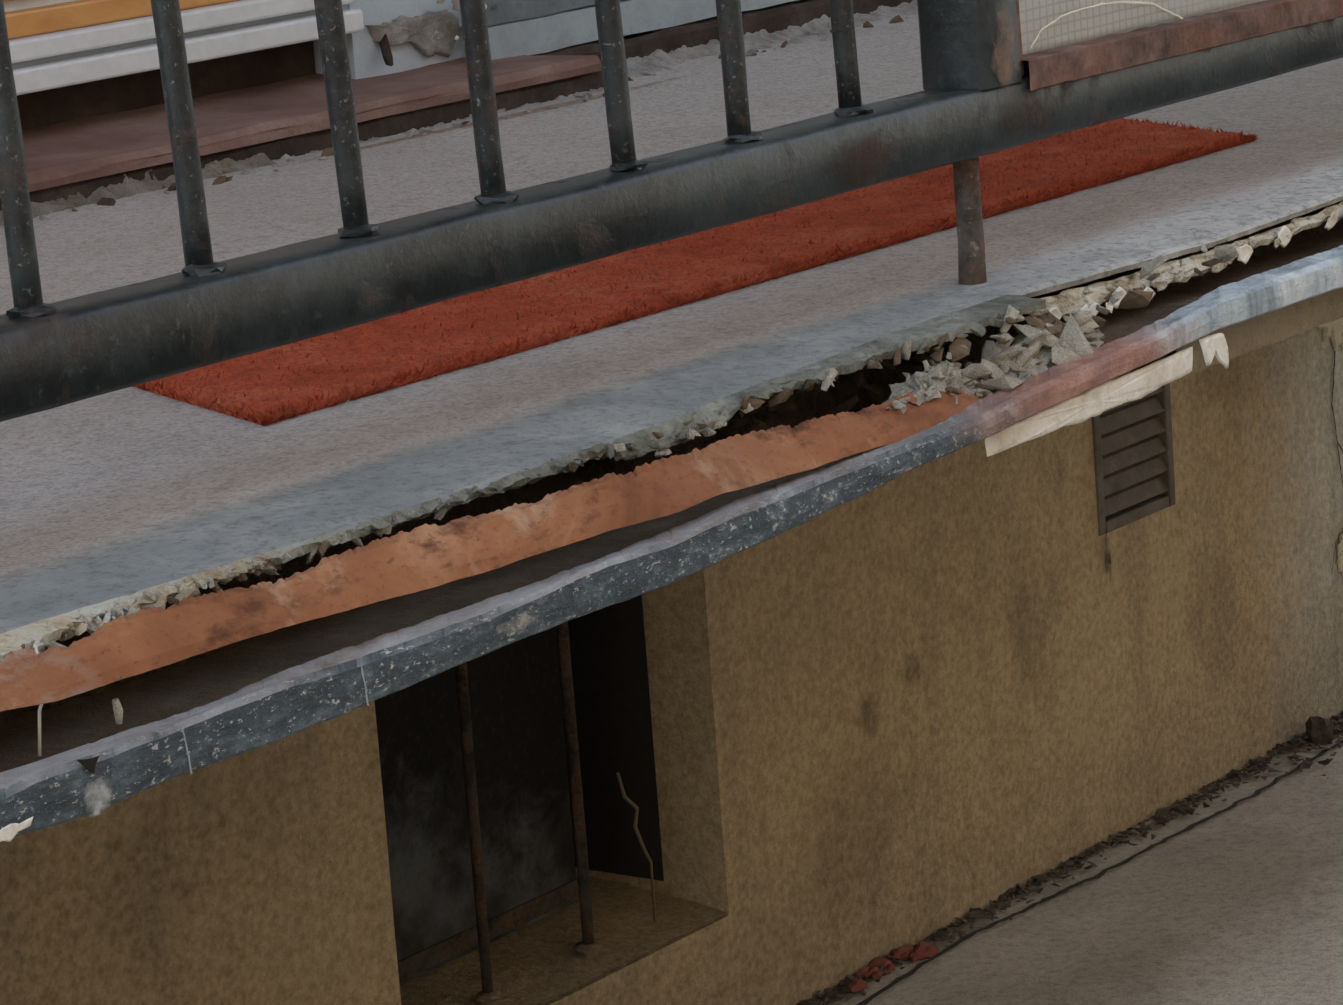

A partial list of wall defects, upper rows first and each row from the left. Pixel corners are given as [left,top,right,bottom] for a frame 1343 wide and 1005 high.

peeling [1274,225,1292,248]
peeling [1325,212,1338,230]
spalling [551,244,1253,489]
crack [1331,351,1343,483]
spalling [306,497,448,564]
spalling [21,561,282,654]
peeling [86,780,111,815]